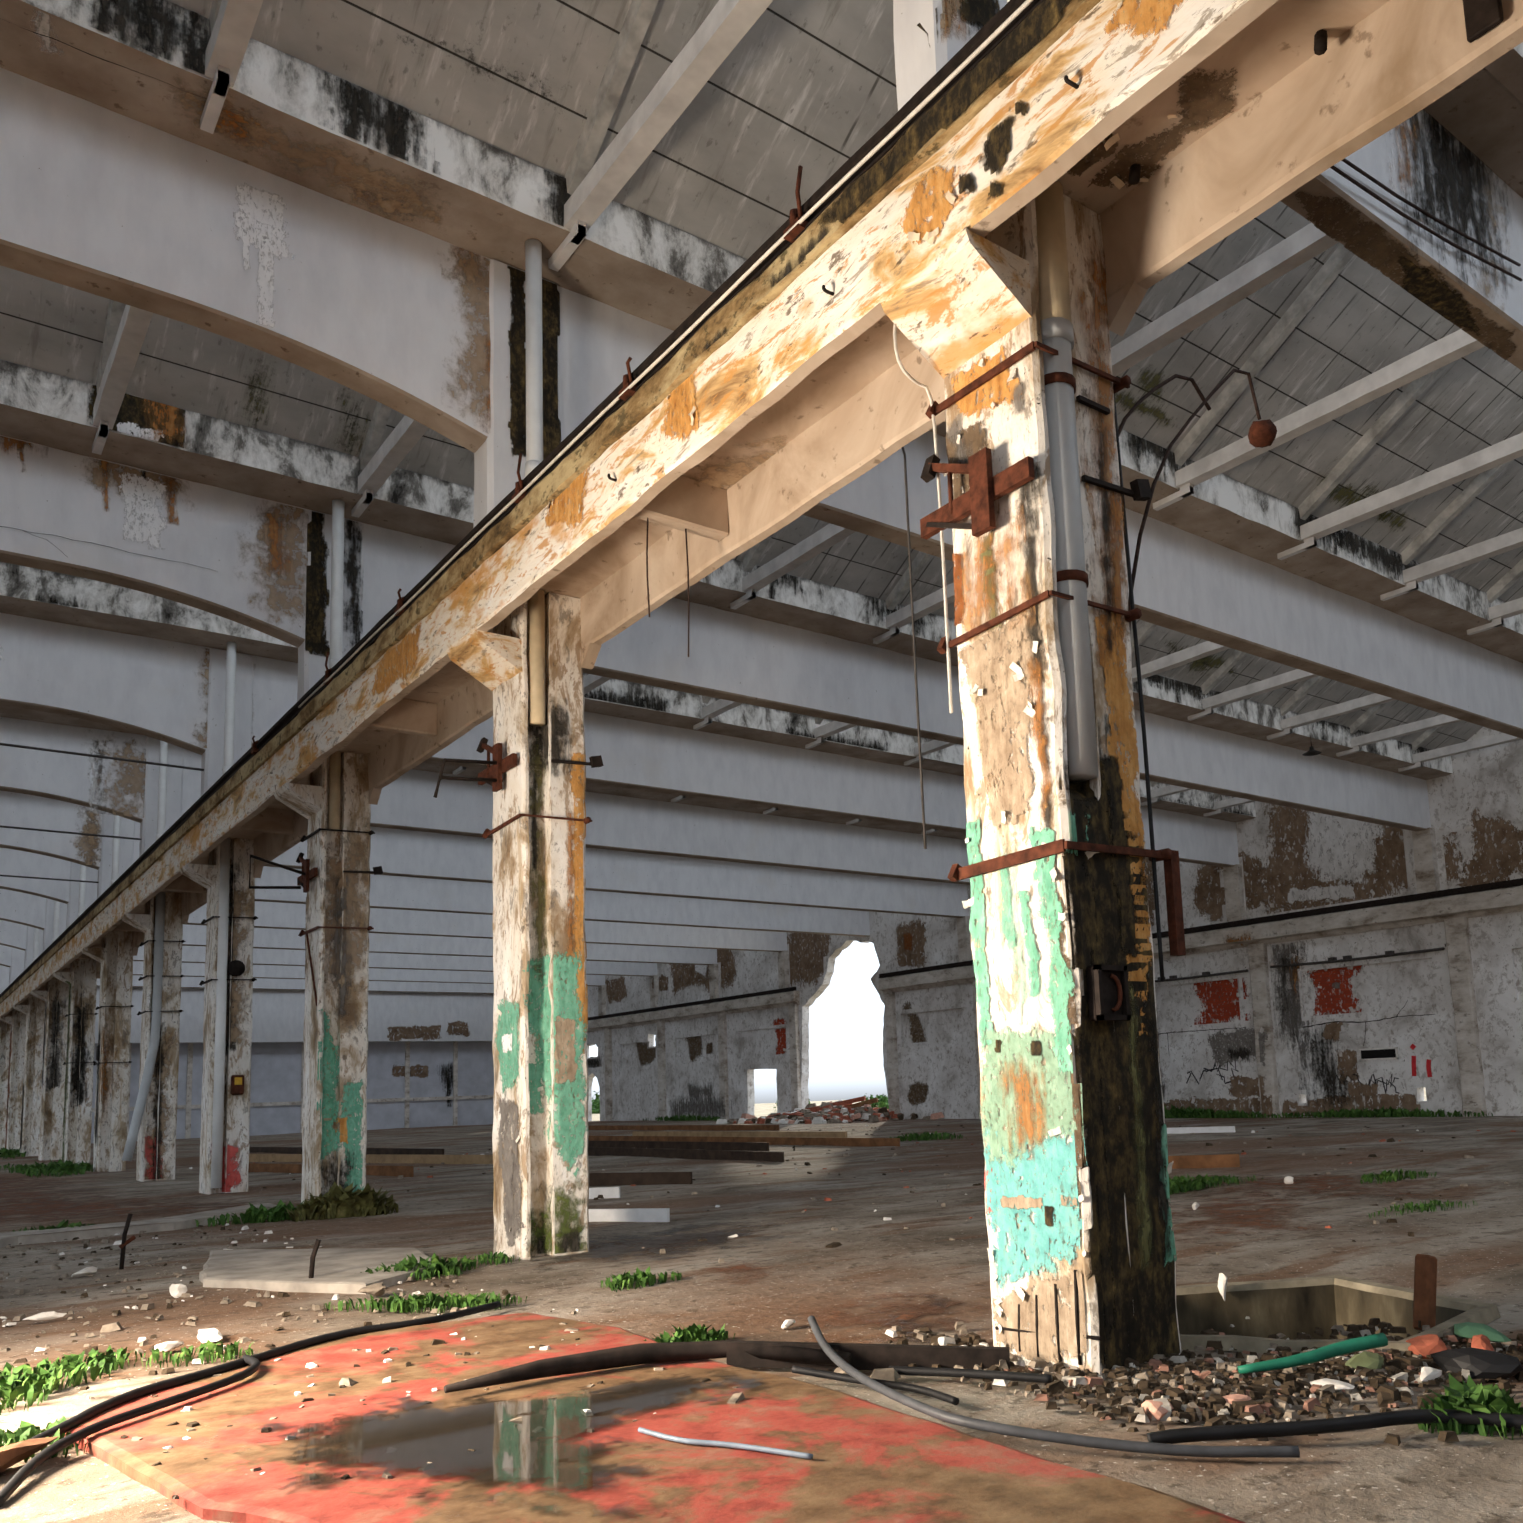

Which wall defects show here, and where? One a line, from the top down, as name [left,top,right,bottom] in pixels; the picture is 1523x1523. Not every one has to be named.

leakage [450,248,561,460]
leakage [770,0,1072,287]
peeling [900,101,1027,245]
peeling [942,345,1022,500]
leakage [1296,110,1516,360]
corrosion [1094,493,1153,1036]
flaking render [1238,804,1408,914]
flaking render [1439,809,1523,887]
peeling [495,949,588,1247]
peeling [959,615,1102,1365]
flaking render [1160,965,1421,1267]
leakage [1281,958,1311,1106]